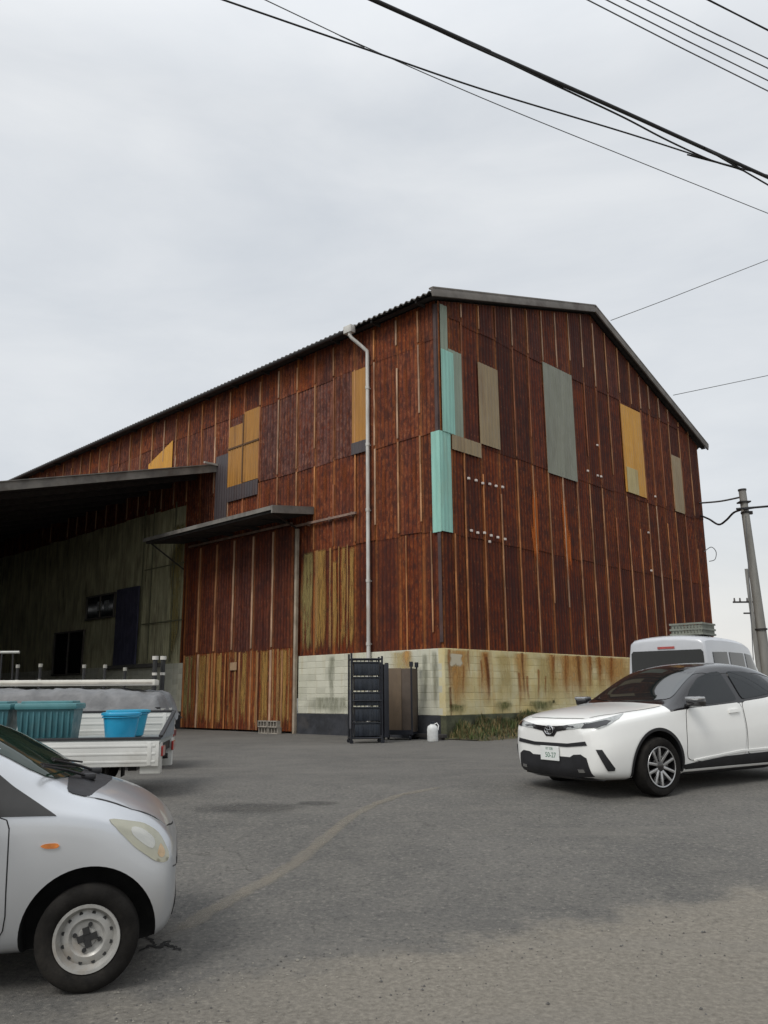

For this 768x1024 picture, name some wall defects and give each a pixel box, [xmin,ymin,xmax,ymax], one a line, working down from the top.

corrosion [562,501,572,568]
corrosion [448,650,489,710]
corrosion [501,653,624,689]
crack [139,936,182,951]